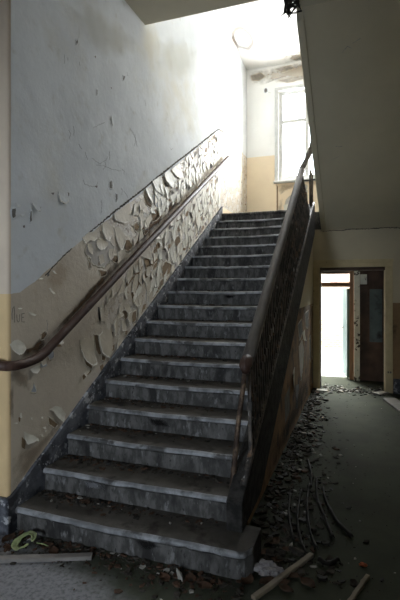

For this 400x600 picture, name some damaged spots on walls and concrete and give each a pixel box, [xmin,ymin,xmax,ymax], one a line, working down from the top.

peeling [275,65,303,83]
peeling [80,129,227,380]
peeling [30,340,64,373]
peeling [22,406,66,449]